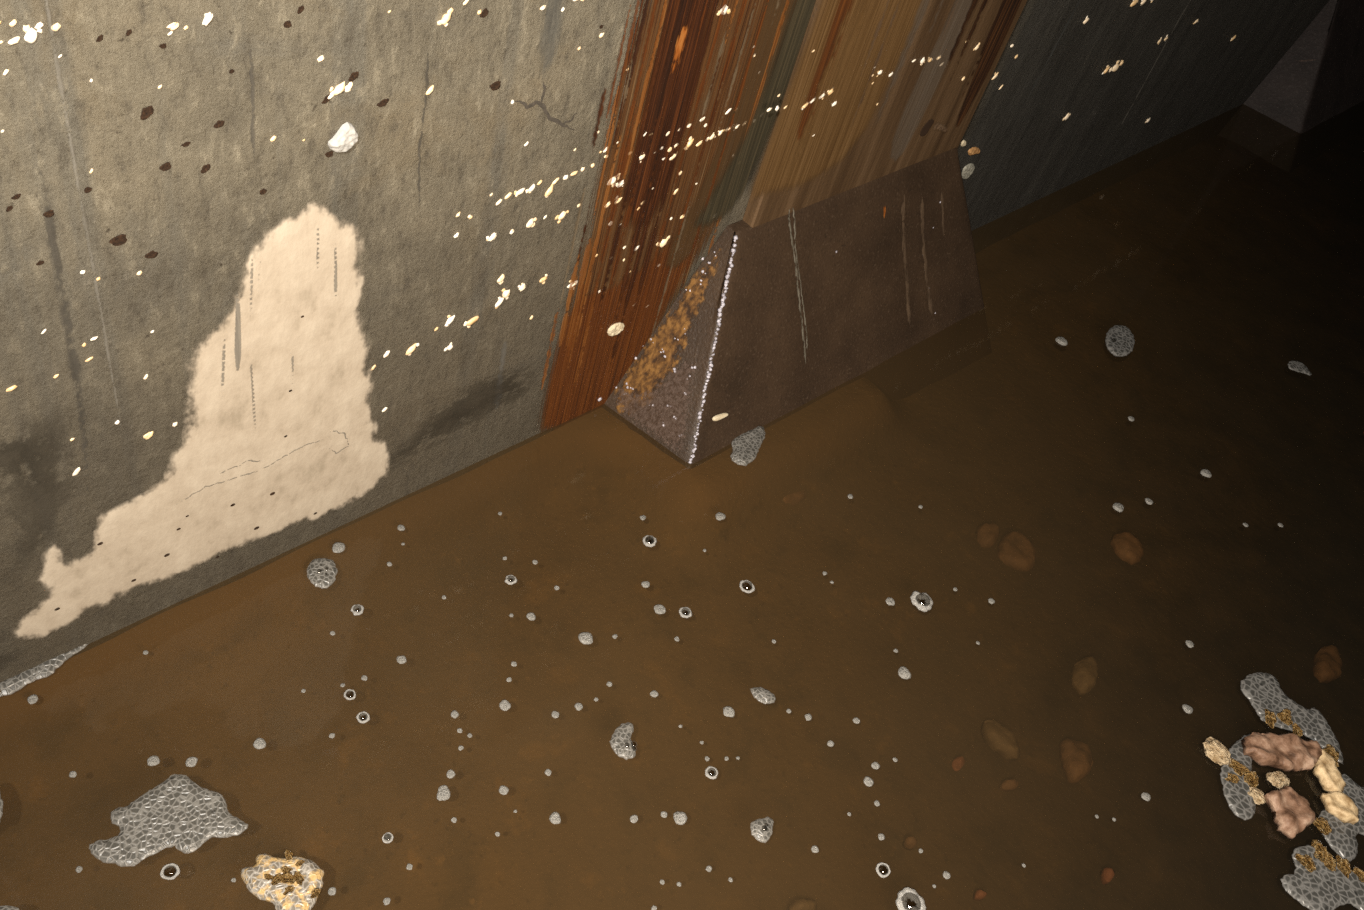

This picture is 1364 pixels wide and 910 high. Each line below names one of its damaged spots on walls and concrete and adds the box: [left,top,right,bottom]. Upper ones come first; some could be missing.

peeling [15,203,389,638]
corrosion [540,0,797,449]
corrosion [753,0,928,196]
corrosion [945,0,1022,126]